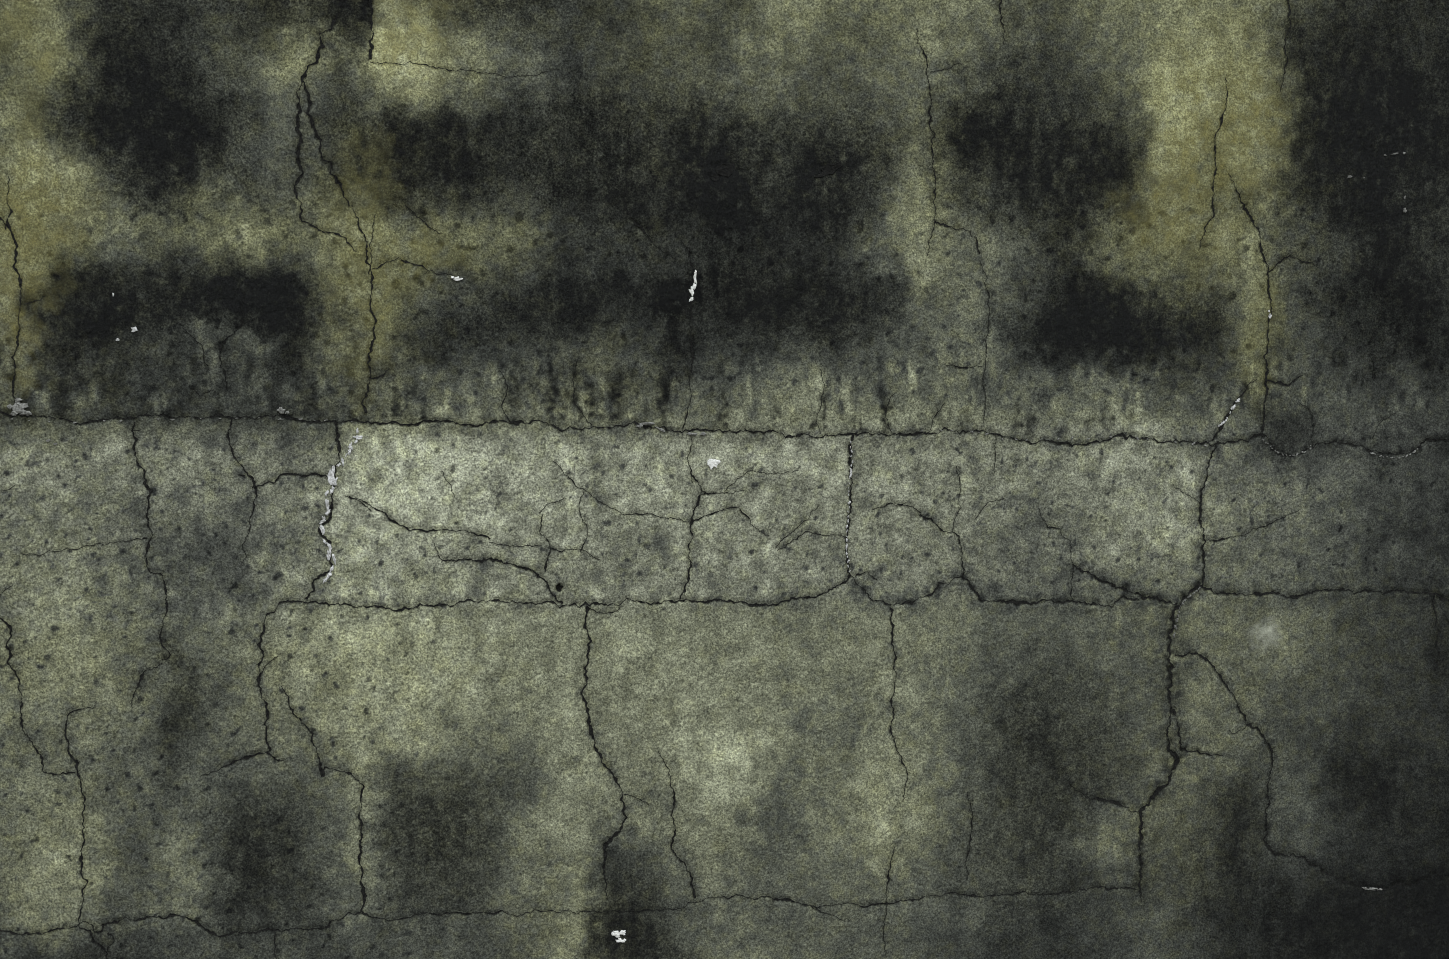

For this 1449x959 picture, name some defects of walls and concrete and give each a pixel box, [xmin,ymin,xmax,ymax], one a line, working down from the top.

crack [0,176,46,404]
leakage [65,0,237,216]
leakage [0,187,315,363]
crack [293,0,452,413]
leakage [335,89,899,423]
crack [622,120,697,271]
crack [916,29,990,418]
leakage [947,61,1133,267]
leakage [1022,273,1221,366]
crack [1200,78,1228,248]
crack [23,173,1449,913]
crack [0,618,1135,959]